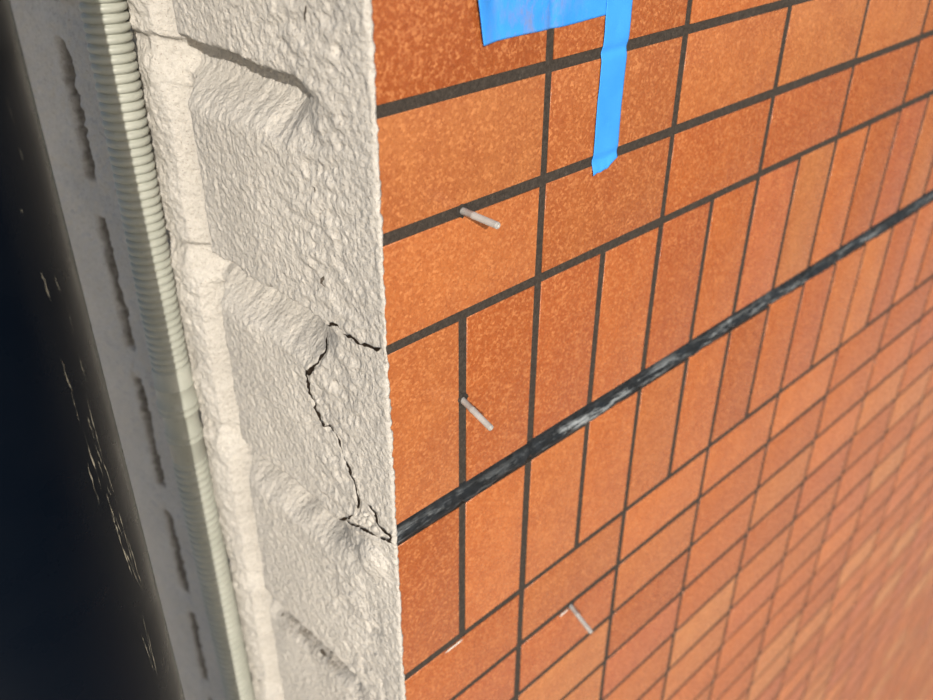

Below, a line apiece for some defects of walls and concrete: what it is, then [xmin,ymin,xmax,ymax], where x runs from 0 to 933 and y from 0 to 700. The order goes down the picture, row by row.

crack [305,322,392,543]